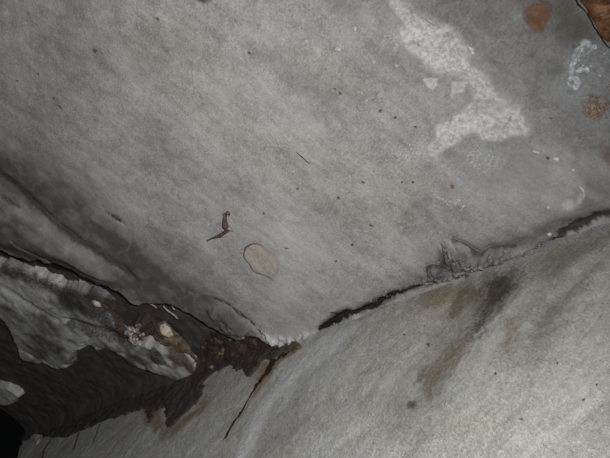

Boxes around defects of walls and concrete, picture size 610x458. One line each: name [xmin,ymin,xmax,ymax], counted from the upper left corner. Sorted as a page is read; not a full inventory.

rust [526,1,550,31]
rust [576,0,610,48]
water stain [550,39,610,127]
crack [506,209,610,261]
spalling [0,253,94,285]
crack [318,281,435,330]
water stain [419,270,518,397]
spalling [0,291,295,443]
rust [257,342,301,391]
crack [223,350,291,440]